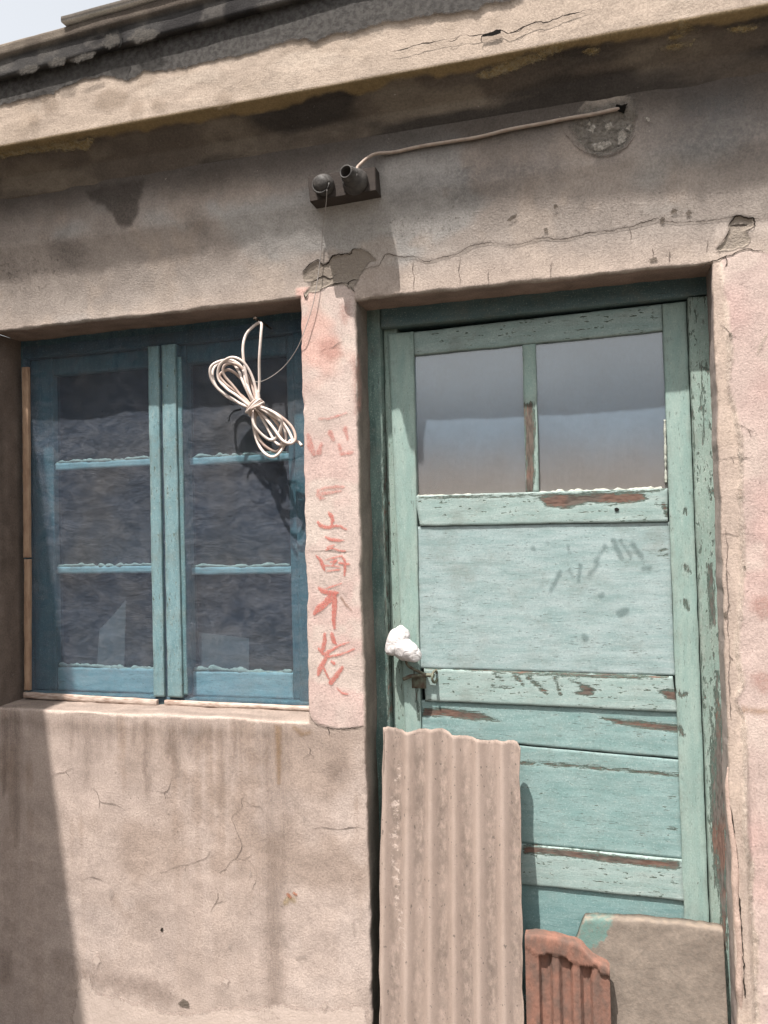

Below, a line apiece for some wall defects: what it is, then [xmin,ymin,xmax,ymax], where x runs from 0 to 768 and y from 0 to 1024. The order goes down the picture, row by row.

crack [392,9,590,52]
water stain [90,182,142,224]
flaking render [303,248,376,298]
crack [366,216,768,288]
flaking render [717,215,756,251]
crack [170,803,264,910]